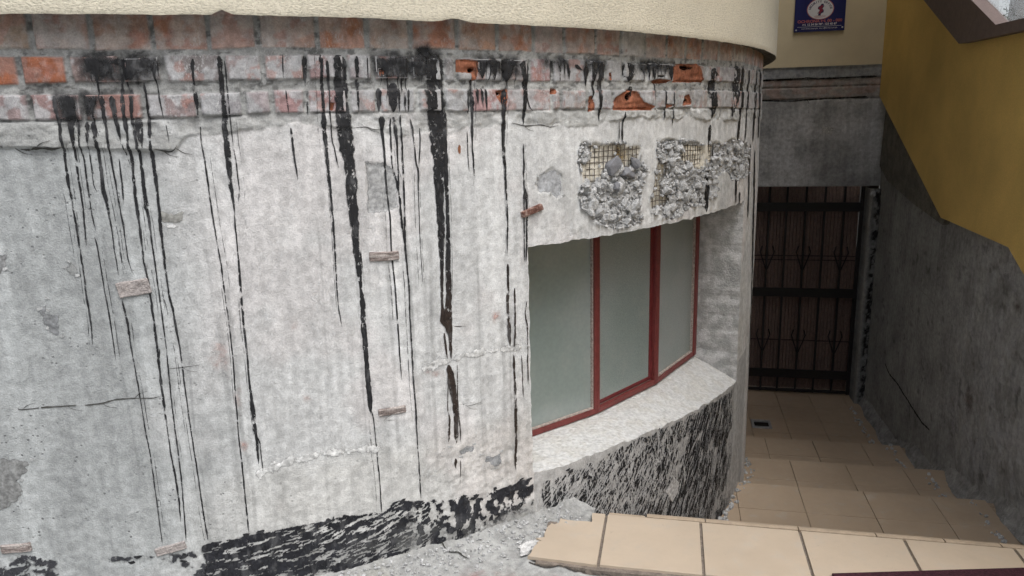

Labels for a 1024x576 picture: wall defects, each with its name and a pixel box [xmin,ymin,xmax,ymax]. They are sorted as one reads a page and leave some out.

crack [15,141,62,155]
crack [4,391,159,411]
leakage [52,53,208,540]
leakage [190,56,263,531]
leakage [302,45,461,512]
spalling [456,59,478,80]
leakage [467,57,533,251]
leakage [506,264,529,468]
leakage [542,57,605,119]
spalling [535,138,751,230]
spalling [613,64,704,111]
leakage [731,66,761,359]